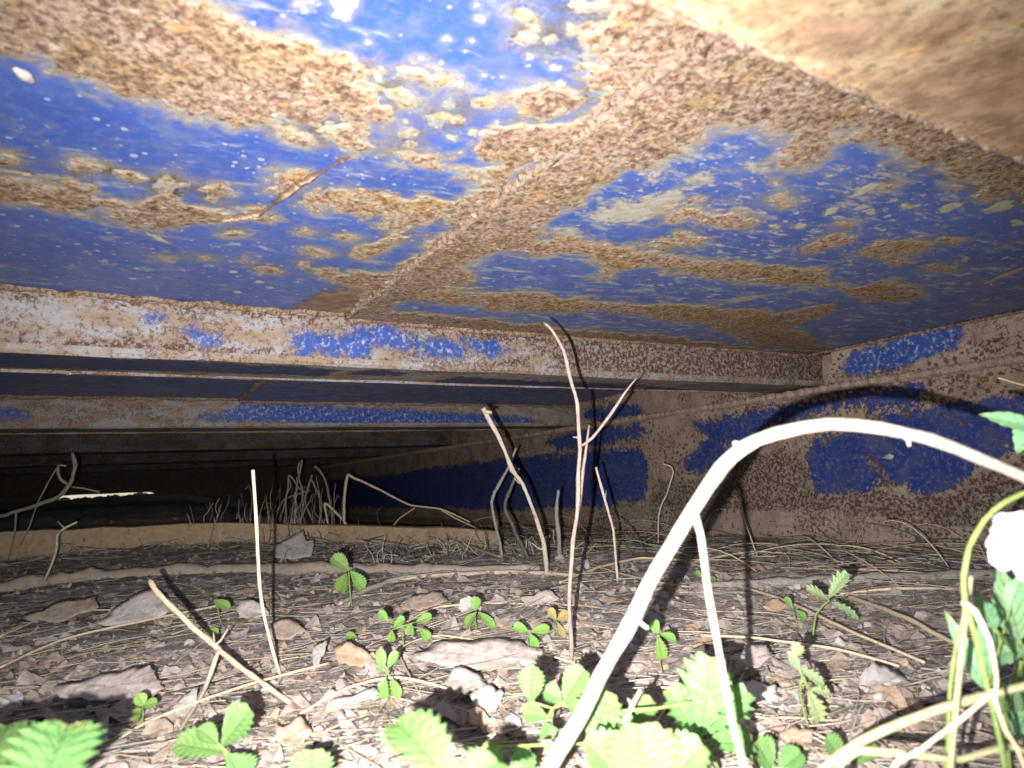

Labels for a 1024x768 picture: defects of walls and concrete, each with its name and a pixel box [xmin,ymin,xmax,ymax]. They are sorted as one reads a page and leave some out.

spalling [329,0,359,22]
spalling [526,53,578,88]
spalling [446,128,479,154]
crack [150,157,349,228]
corrosion [0,0,1024,381]
peeling [549,161,718,236]
peeling [740,157,797,209]
peeling [796,207,968,273]
peeling [196,403,534,423]
peeling [682,325,1024,497]
corrosion [651,476,704,512]
corrosion [698,431,1024,527]